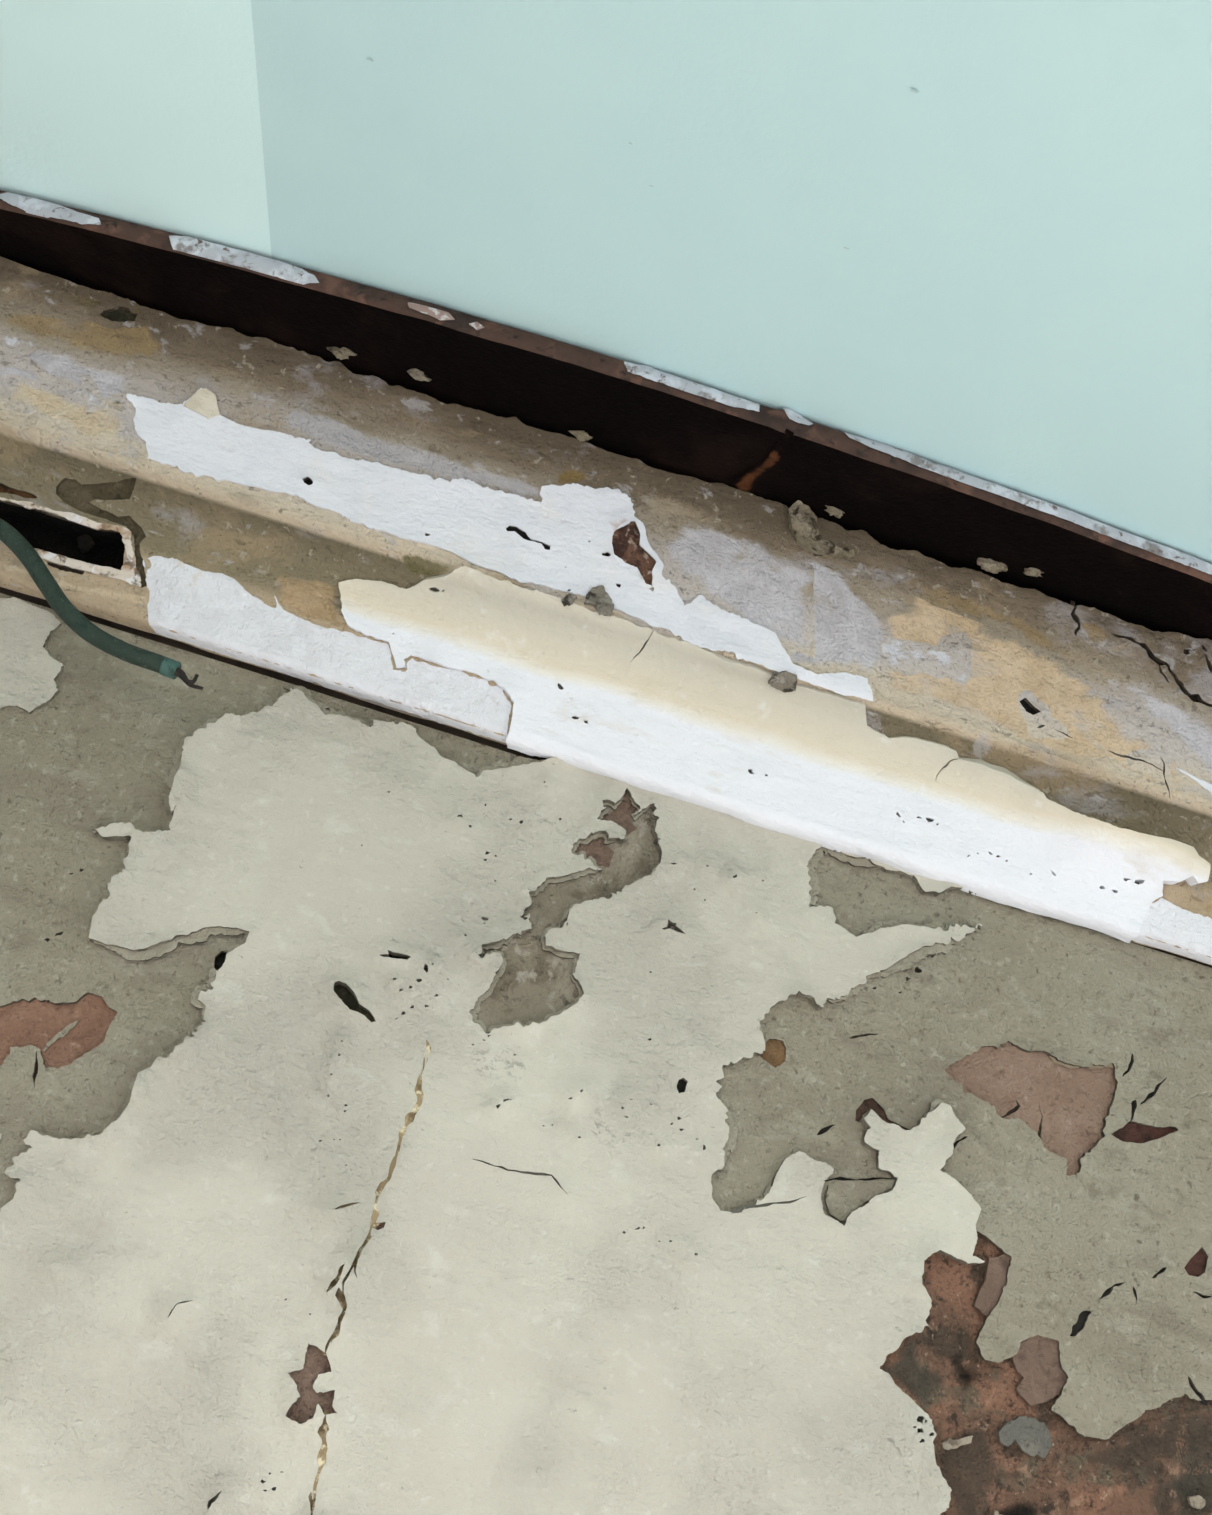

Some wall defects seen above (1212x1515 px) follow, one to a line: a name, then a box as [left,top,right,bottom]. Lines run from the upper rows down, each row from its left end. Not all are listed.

corrosion [732,429,794,494]
flaking render [48,563,84,575]
flaking render [57,478,147,588]
spalling [506,527,550,550]
corrosion [606,510,664,589]
crack [1070,601,1079,634]
crack [1118,637,1211,707]
peeling [0,566,1212,1515]
crack [322,1040,431,1356]
crack [309,1410,329,1515]